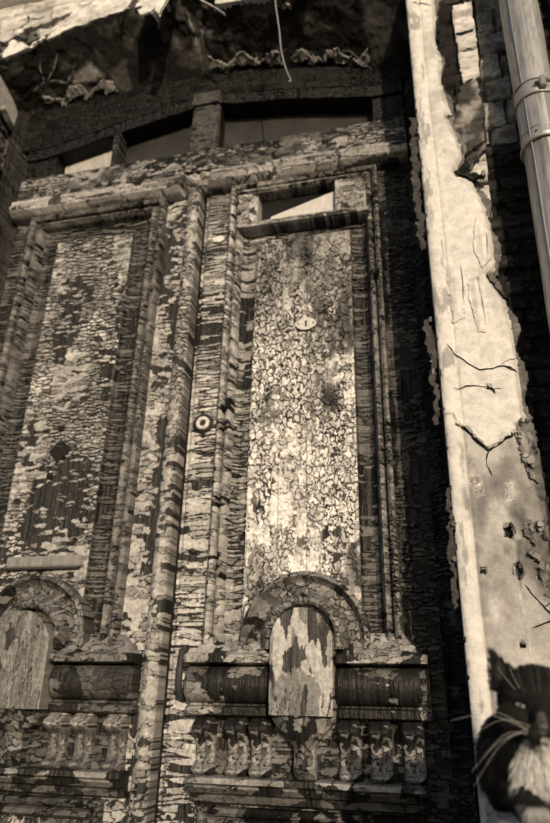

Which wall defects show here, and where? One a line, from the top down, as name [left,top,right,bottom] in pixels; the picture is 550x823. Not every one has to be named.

flaking render [207,47,370,73]
spalling [437,3,461,115]
flaking render [42,78,118,106]
flaking render [408,116,427,251]
spalling [454,162,486,182]
spalling [487,273,510,305]
crack [448,343,519,393]
crack [455,420,528,475]